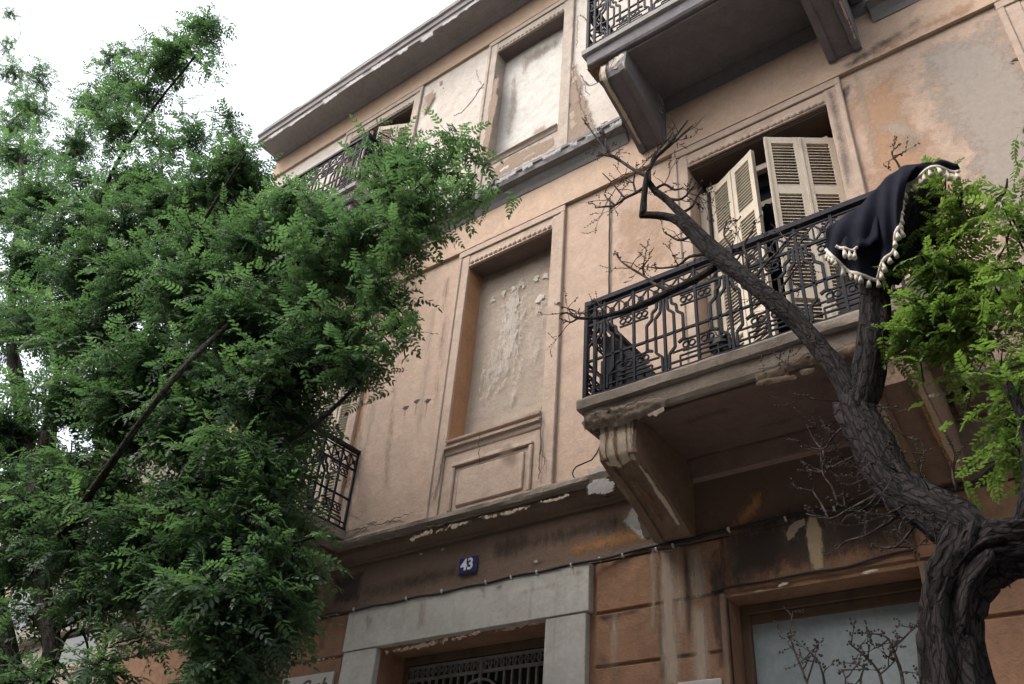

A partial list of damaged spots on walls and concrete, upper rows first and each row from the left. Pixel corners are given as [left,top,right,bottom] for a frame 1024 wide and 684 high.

peeling [568,53,641,144]
peeling [478,273,549,417]
spalling [755,350,817,386]
crack [537,407,545,479]
peeling [588,420,680,525]
flaking render [345,494,569,546]
flaking render [786,517,824,570]
water stain [651,543,724,684]